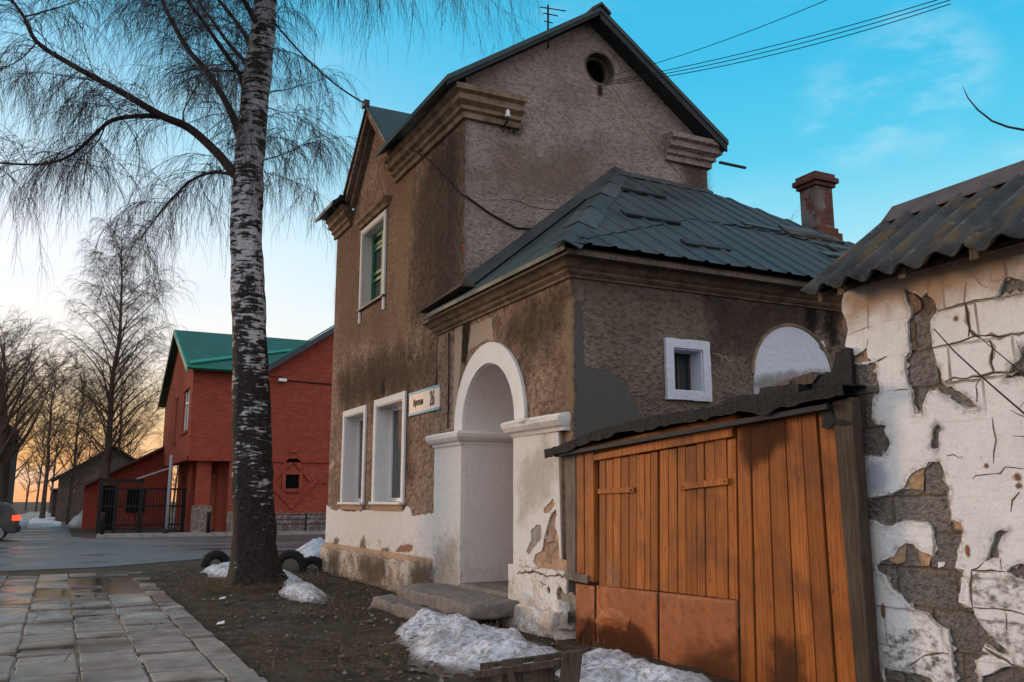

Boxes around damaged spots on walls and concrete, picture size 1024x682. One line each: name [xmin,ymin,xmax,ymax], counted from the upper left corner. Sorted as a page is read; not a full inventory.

spalling [905,288,980,414]
crack [927,251,1024,510]
crack [517,510,565,600]
spalling [527,500,567,571]
spalling [868,423,1024,682]